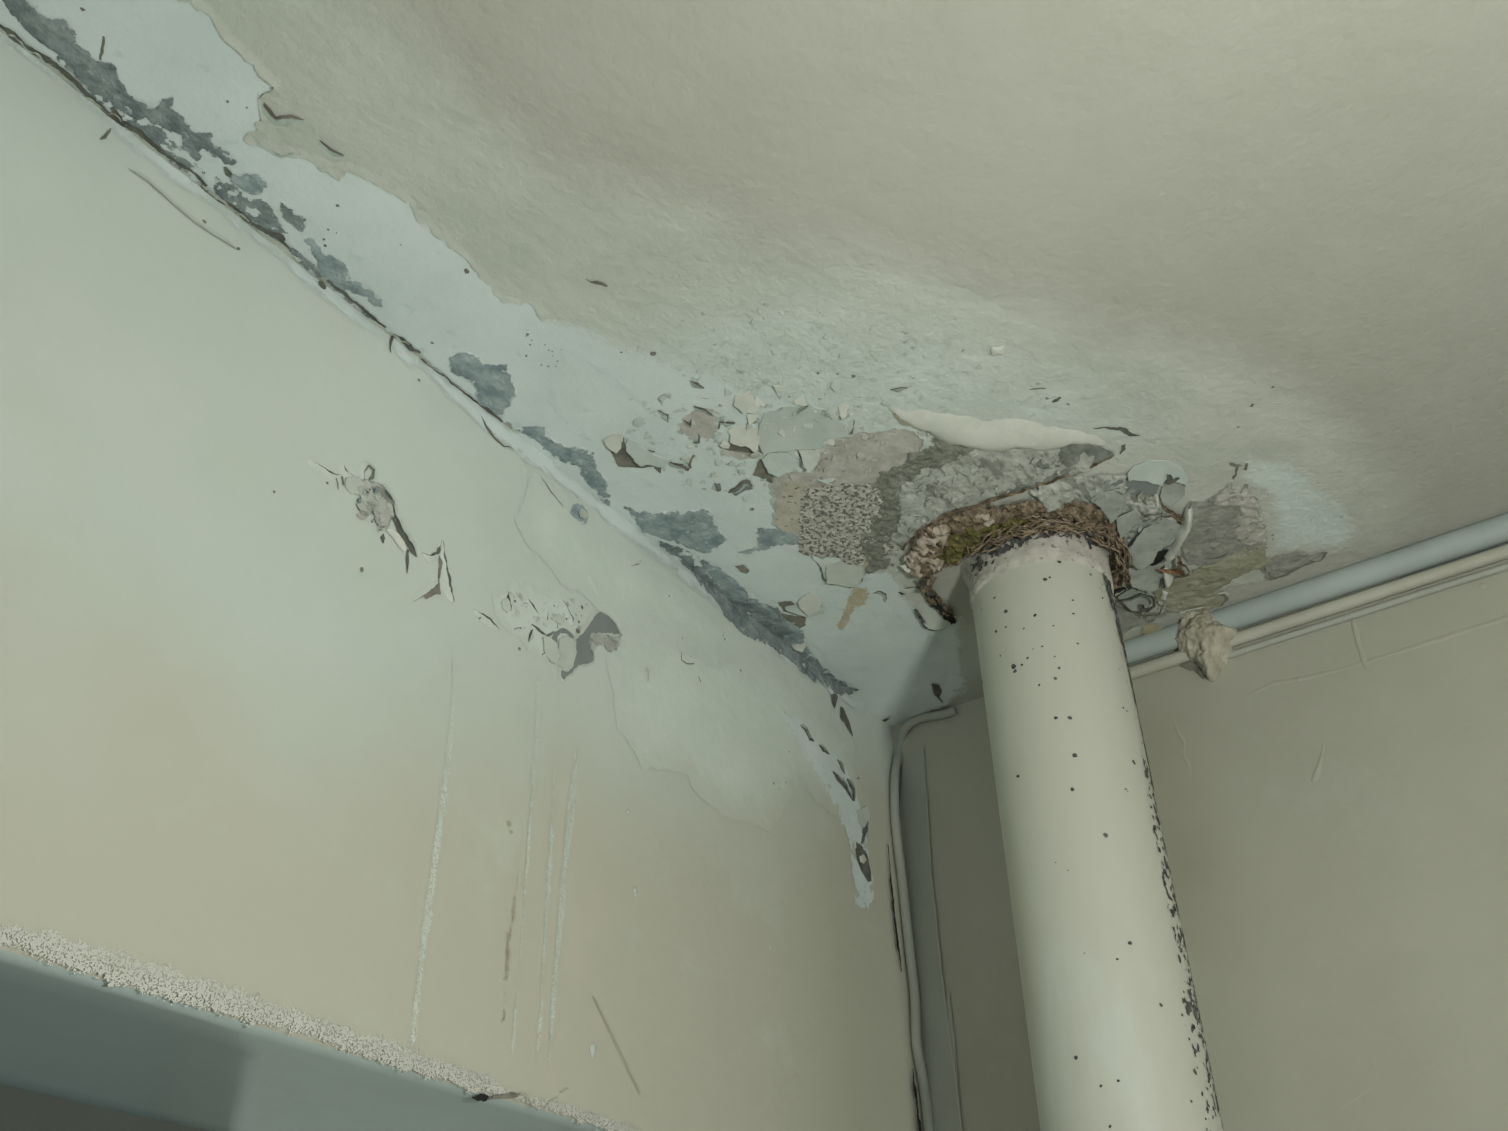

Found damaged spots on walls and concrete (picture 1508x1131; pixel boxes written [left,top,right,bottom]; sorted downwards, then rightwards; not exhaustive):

peeling [0,0,1365,736]
peeling [781,711,874,909]